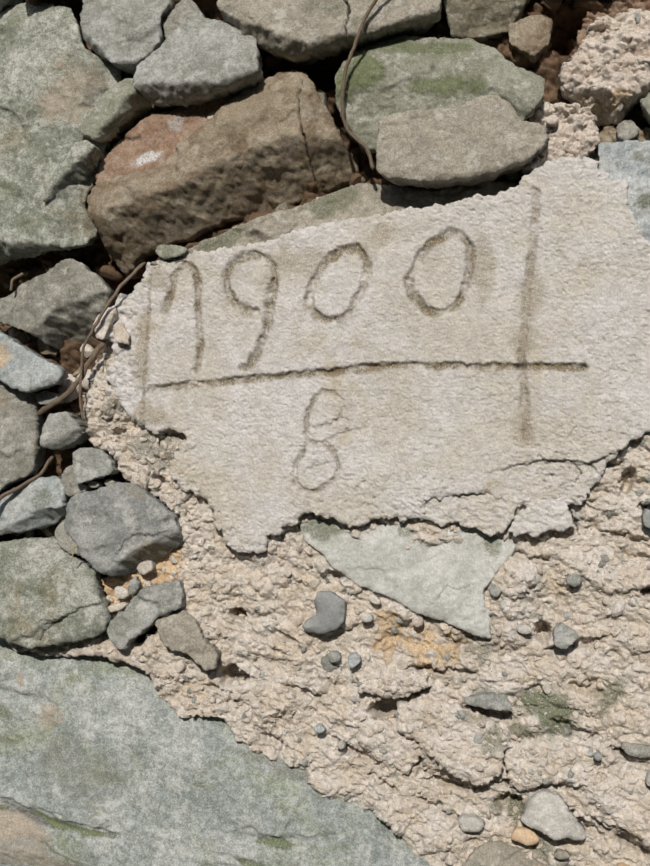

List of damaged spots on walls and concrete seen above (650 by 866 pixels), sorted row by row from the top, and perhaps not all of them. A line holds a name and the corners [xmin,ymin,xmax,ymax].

spalling [83,343,650,866]